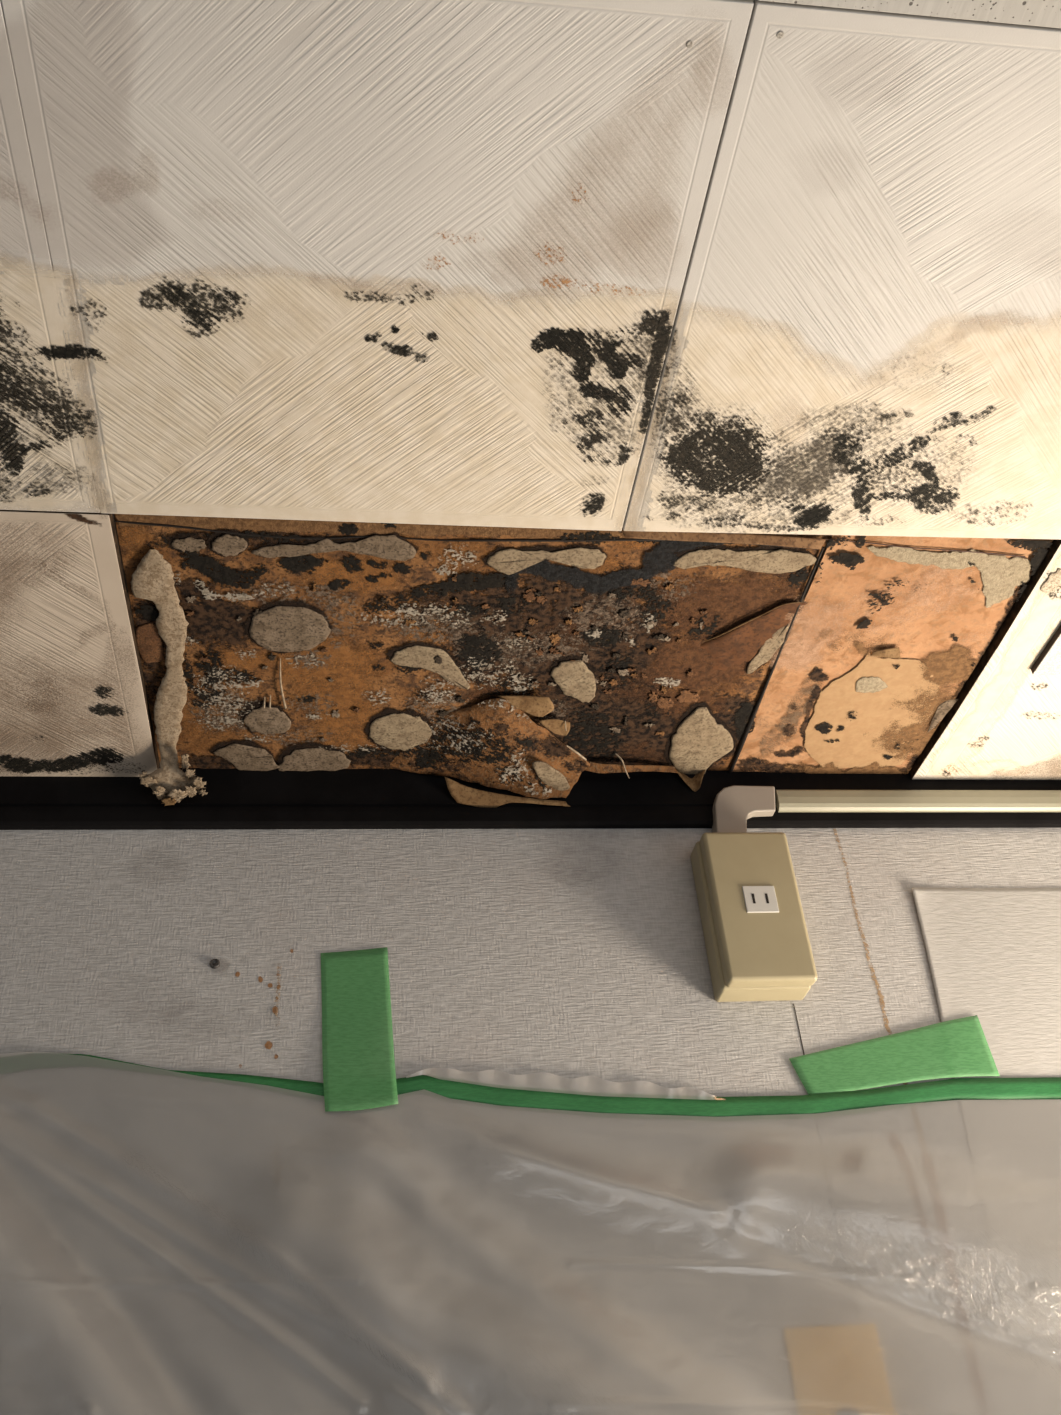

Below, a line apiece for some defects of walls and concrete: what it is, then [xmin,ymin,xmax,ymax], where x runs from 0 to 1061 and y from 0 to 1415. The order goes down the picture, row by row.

damp [0,245,1061,797]
flaking render [130,549,210,806]
peeling [514,605,589,663]
peeling [600,592,667,694]
peeling [646,621,679,655]
rust [258,966,281,1016]